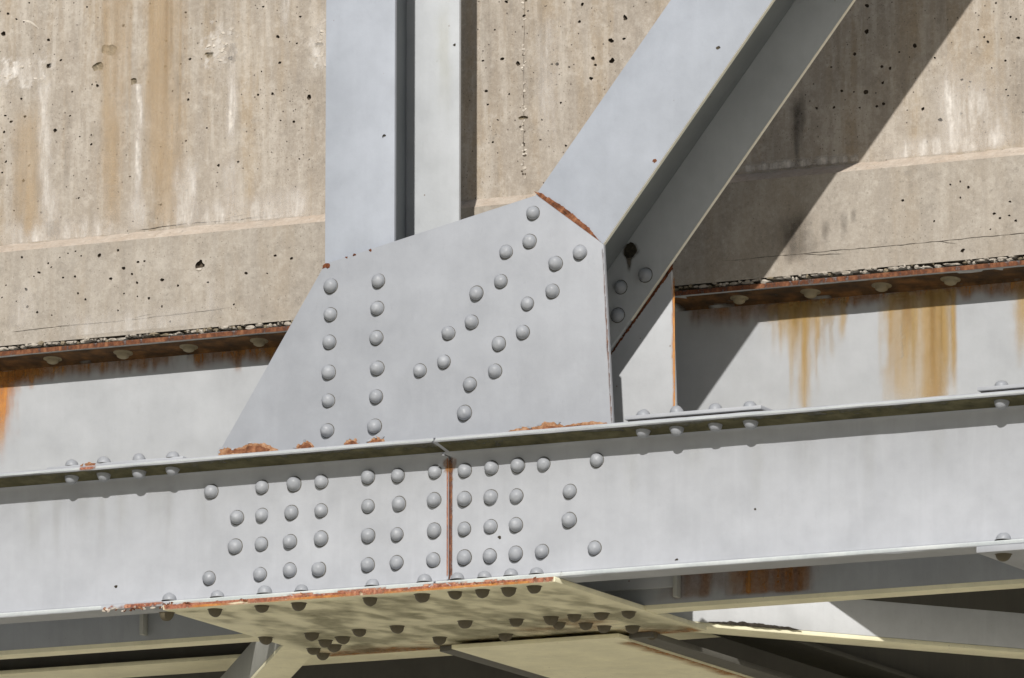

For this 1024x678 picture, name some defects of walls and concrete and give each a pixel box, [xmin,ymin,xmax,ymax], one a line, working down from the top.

corrosion [534,191,601,242]
corrosion [0,326,290,424]
corrosion [607,260,1024,409]
corrosion [102,458,553,613]